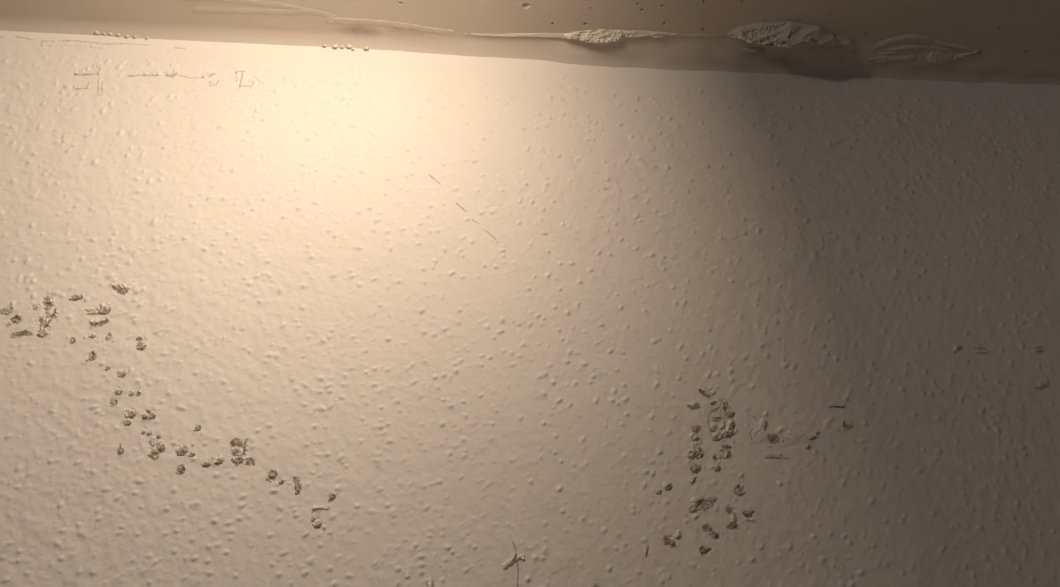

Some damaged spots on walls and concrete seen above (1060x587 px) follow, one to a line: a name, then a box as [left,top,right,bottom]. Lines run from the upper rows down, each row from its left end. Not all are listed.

spalling [727,21,857,62]
spalling [0,280,306,500]
spalling [307,490,340,534]
spalling [651,395,760,560]